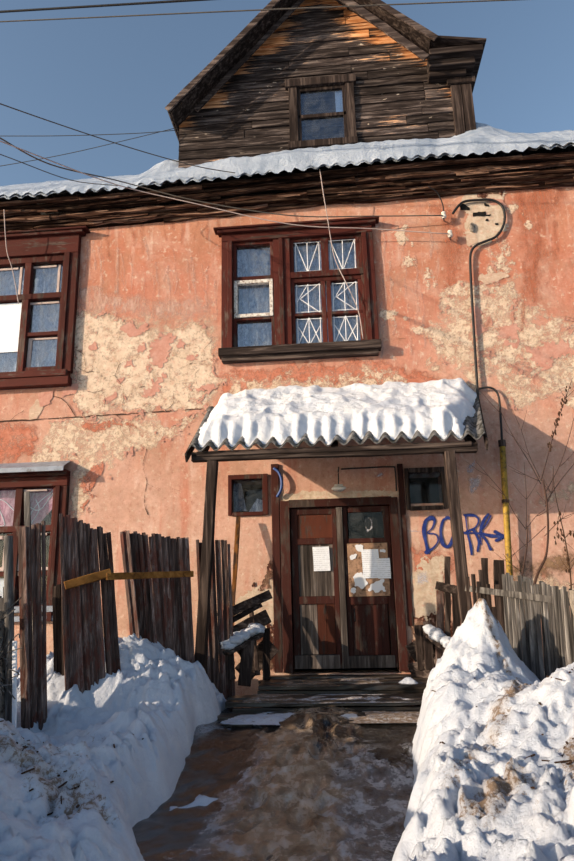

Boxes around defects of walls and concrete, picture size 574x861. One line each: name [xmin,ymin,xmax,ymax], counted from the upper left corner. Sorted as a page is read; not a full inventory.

crack [0,348,205,438]
peeling [0,184,574,516]
spalling [407,547,455,642]